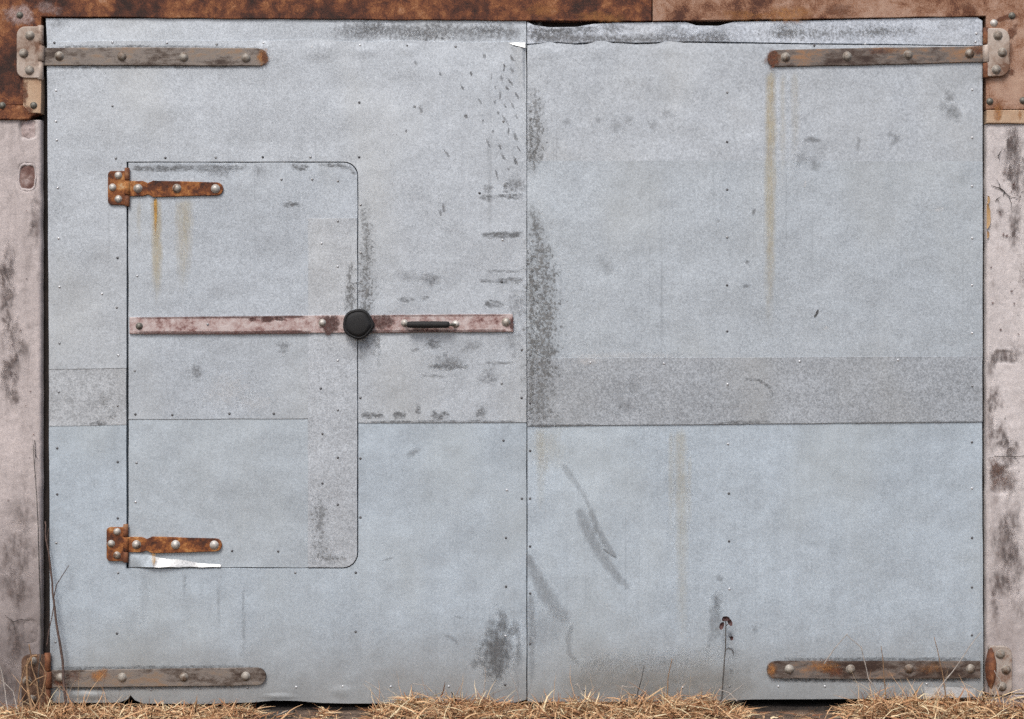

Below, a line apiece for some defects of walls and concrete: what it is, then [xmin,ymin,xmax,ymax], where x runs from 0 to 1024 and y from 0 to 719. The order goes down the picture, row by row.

rust [6,5,33,24]
rust [531,15,723,44]
water stain [0,266,13,326]
water stain [3,354,19,403]
water stain [988,389,1018,489]
water stain [992,515,1020,610]